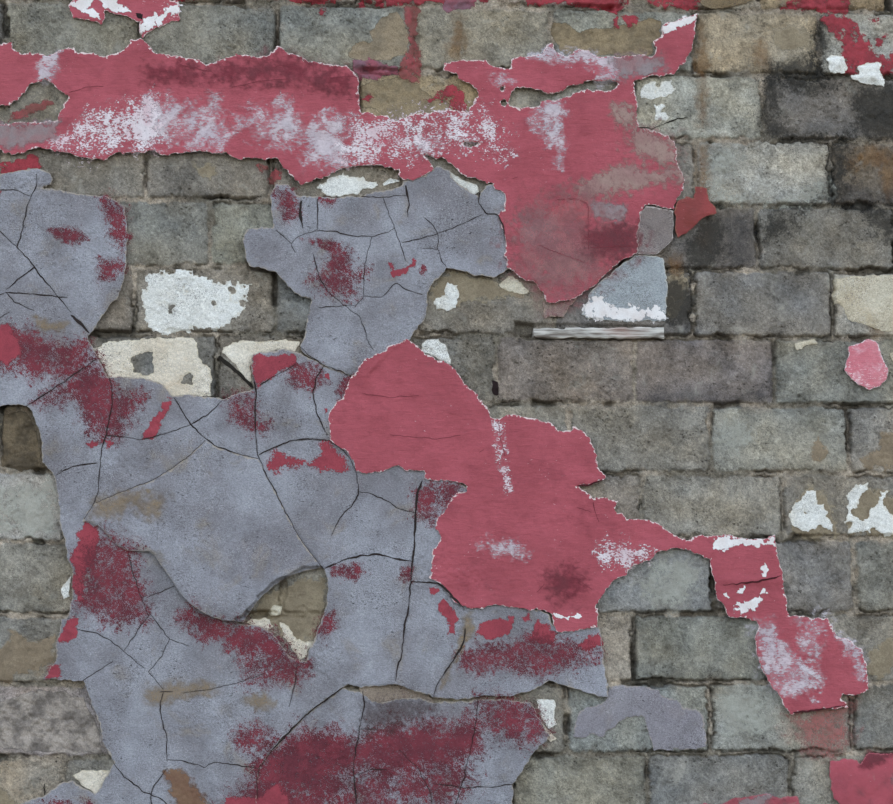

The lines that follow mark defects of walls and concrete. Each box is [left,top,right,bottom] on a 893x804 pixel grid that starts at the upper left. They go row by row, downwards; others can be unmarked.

peeling [8,100,54,122]
crack [0,174,89,333]
crack [276,185,505,349]
crack [27,359,96,406]
peeling [844,339,888,390]
crack [58,347,466,694]
peeling [592,547,648,568]
crack [77,552,385,804]
spalling [0,689,103,755]
crack [399,699,513,804]
peeling [723,793,800,804]
peeling [829,751,893,804]